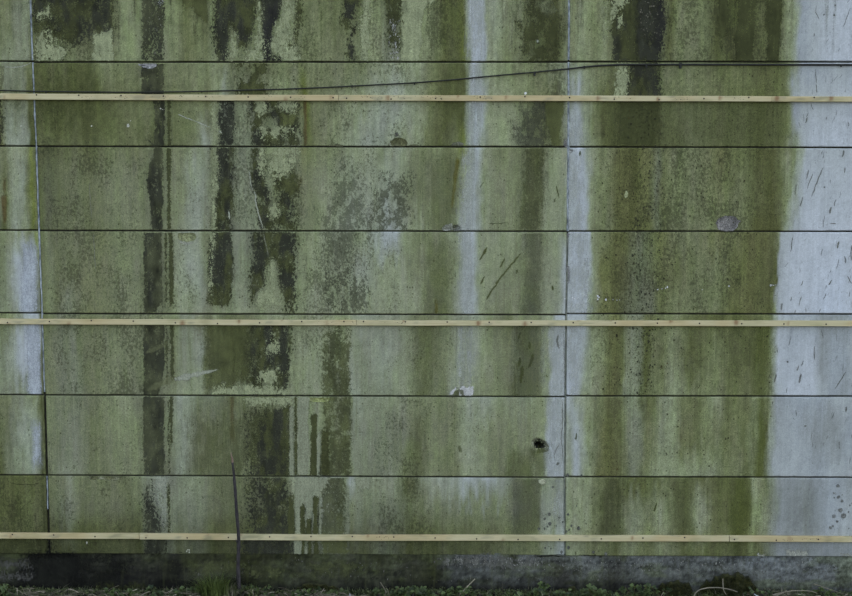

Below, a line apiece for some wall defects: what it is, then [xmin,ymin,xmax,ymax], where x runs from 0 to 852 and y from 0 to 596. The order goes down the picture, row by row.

leakage [717,0,784,61]
leakage [140,0,175,313]
leakage [139,325,175,554]
leakage [286,325,371,555]
spalling [531,438,549,453]